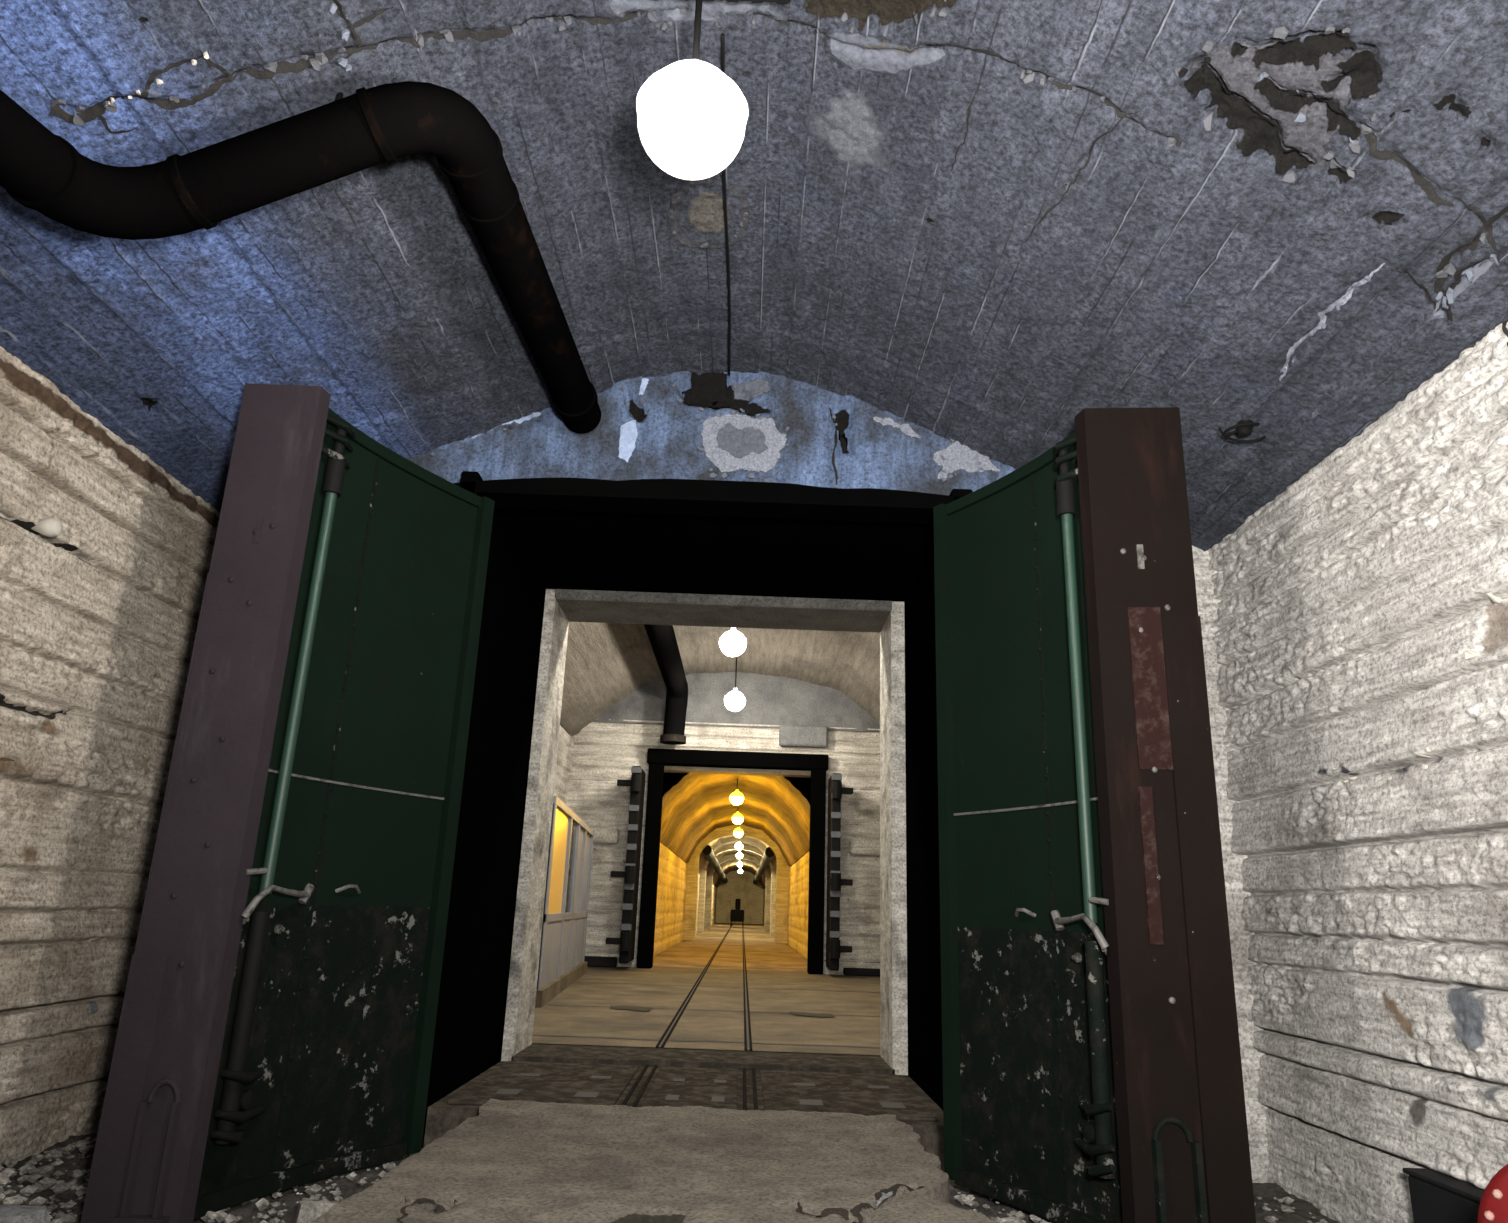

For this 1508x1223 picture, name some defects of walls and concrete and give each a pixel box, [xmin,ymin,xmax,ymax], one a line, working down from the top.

peeling [609,0,784,30]
spalling [803,0,956,74]
crack [50,0,688,134]
spalling [1175,26,1454,208]
spalling [620,386,651,422]
peeling [431,412,541,457]
peeling [672,372,789,482]
peeling [873,417,920,438]
peeling [933,439,1000,482]
crack [0,693,72,720]
water stain [1448,982,1485,1049]
crack [796,1184,926,1223]